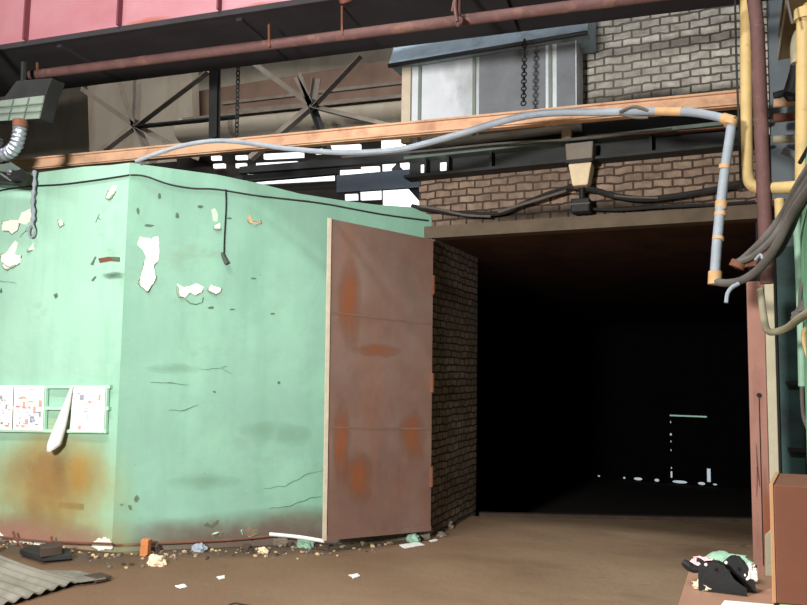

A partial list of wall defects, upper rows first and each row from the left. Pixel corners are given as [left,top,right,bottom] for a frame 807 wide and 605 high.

peeling [0,209,35,271]
peeling [137,237,159,293]
peeling [177,283,222,298]
corrosion [13,448,84,531]
crack [263,470,322,509]